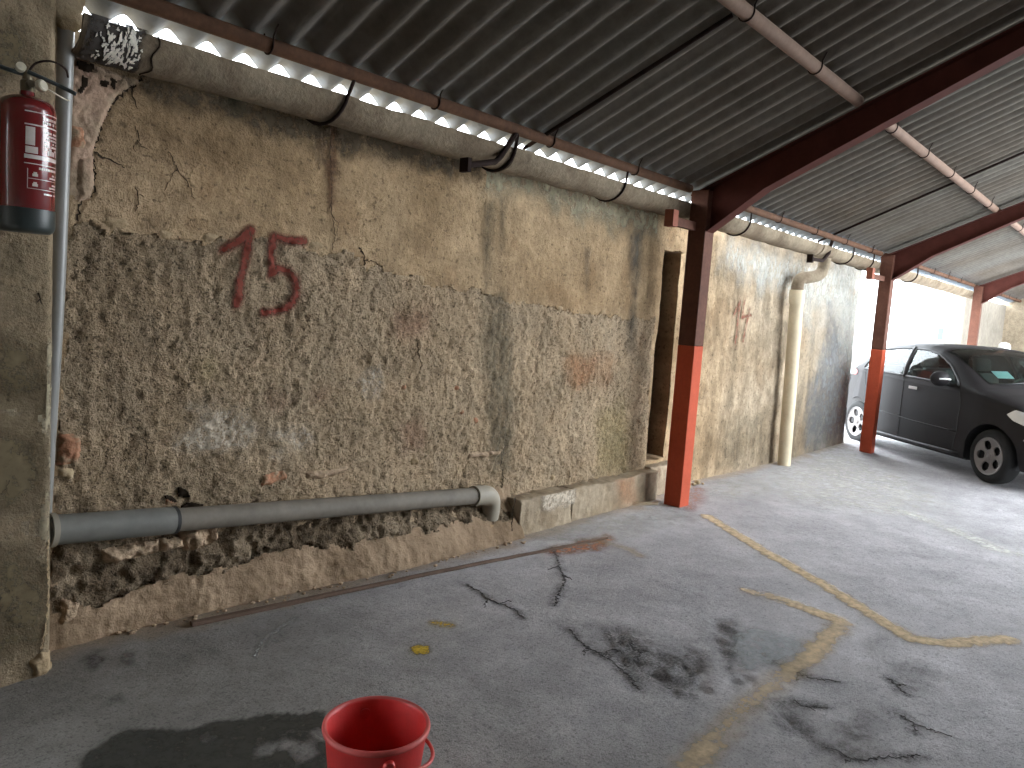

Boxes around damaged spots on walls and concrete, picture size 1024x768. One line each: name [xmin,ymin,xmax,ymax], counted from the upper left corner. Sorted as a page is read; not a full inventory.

flaking render [69,12,147,202]
crack [73,36,194,226]
flaking render [29,216,656,676]
crack [466,584,522,616]
crack [548,551,572,606]
crack [569,629,647,690]
crack [764,655,839,710]
crack [825,678,950,763]